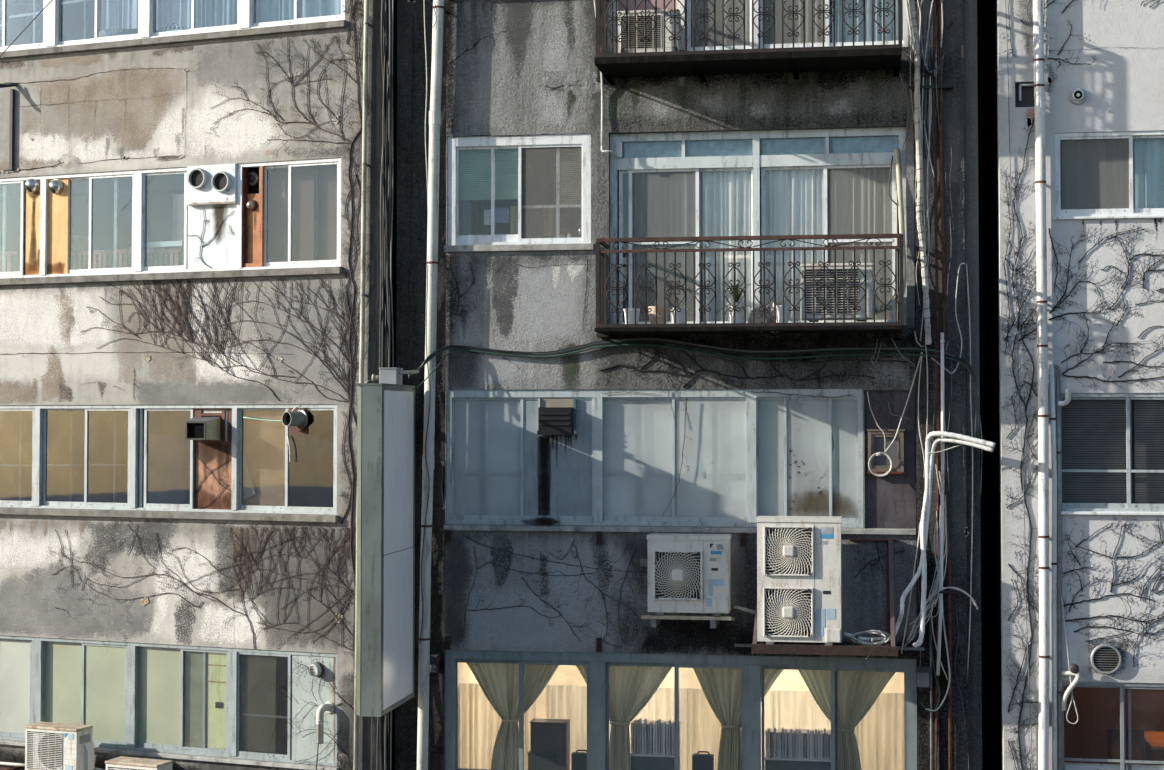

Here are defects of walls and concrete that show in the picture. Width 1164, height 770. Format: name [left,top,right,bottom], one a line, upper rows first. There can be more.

leakage [456,0,533,75]
leakage [0,0,375,408]
leakage [444,254,588,336]
leakage [197,443,231,466]
leakage [536,435,577,525]
leakage [0,518,179,641]
leakage [173,598,196,645]
leakage [194,491,356,653]